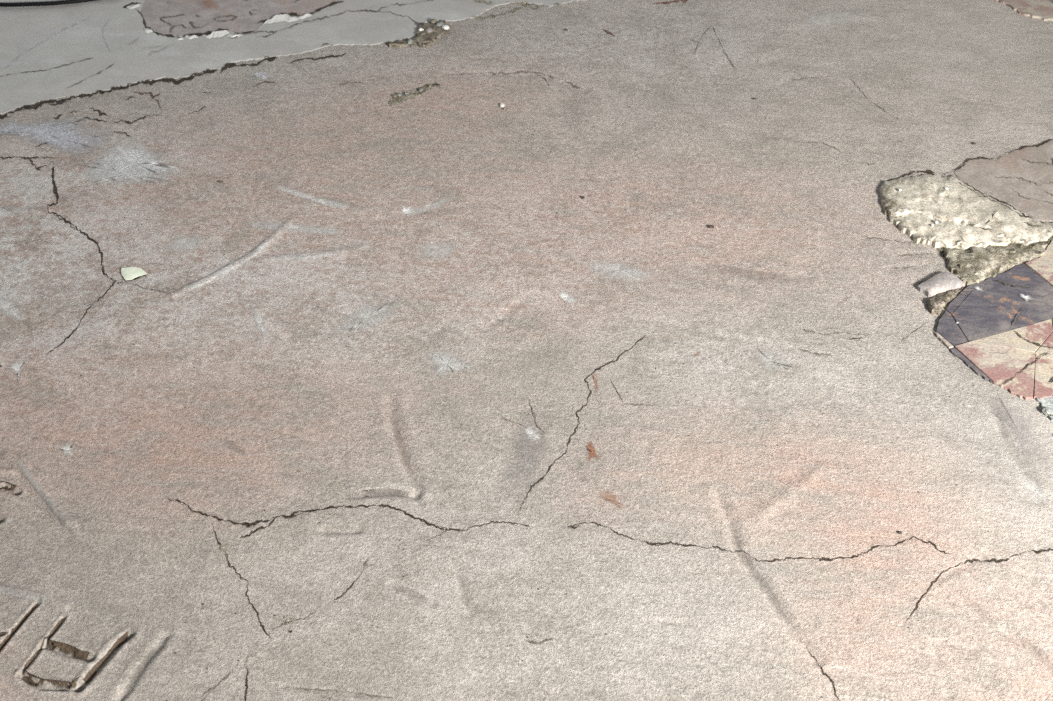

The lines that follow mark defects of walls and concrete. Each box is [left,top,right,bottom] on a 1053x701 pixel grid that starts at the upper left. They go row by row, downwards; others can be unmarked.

spalling [123,0,344,40]
spalling [995,0,1053,21]
hole [389,82,440,107]
crack [0,18,170,353]
crack [866,236,933,269]
crack [801,329,865,356]
spalling [936,240,1053,400]
crack [166,335,655,701]
crack [568,522,1053,622]
crack [808,650,839,699]